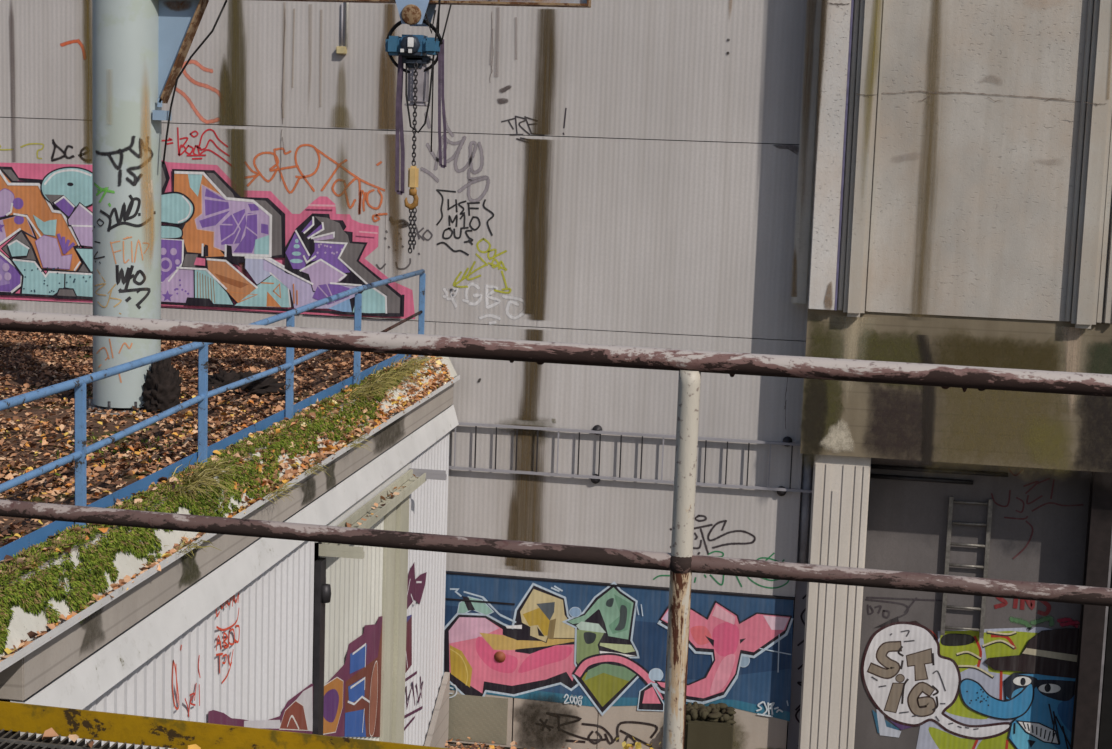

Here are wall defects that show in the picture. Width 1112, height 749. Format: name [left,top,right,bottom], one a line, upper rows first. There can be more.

water stain [220,0,246,197]
crack [856,90,1107,105]
water stain [524,9,555,341]
water stain [917,0,939,317]
water stain [845,317,863,359]
water stain [919,335,933,364]
water stain [508,362,541,542]
water stain [801,380,935,465]
water stain [1071,394,1112,485]
water stain [507,557,540,572]